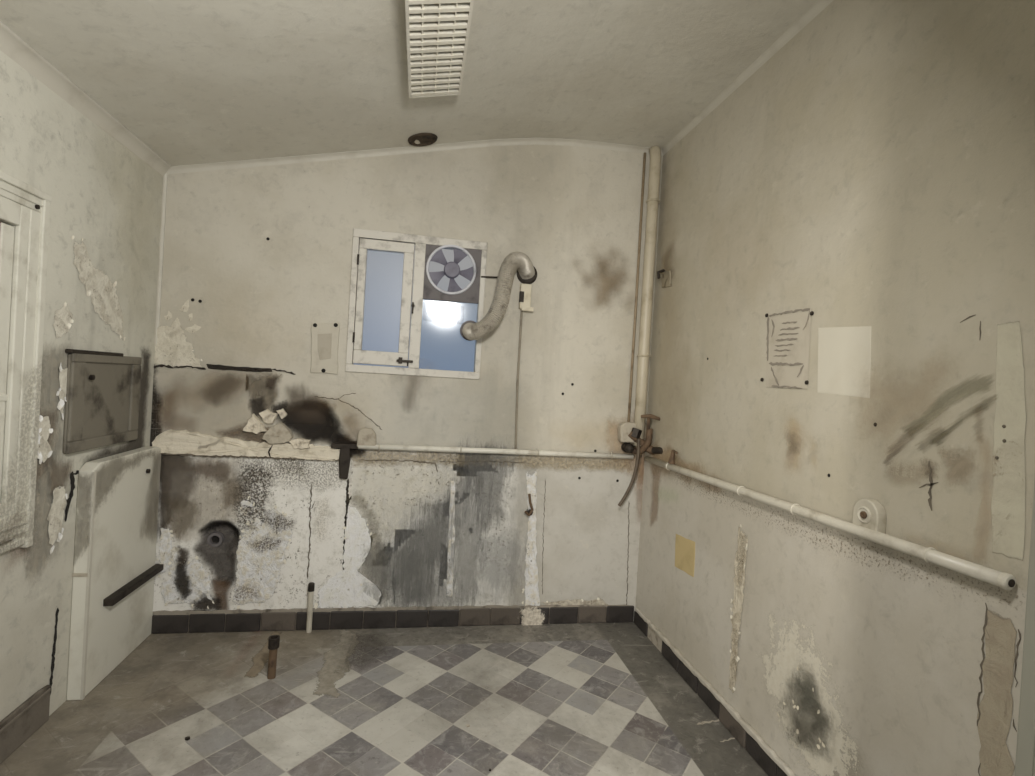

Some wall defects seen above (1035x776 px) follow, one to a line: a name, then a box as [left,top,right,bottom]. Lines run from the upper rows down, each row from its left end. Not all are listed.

peeling [154,300,203,369]
damp [89,352,300,611]
peeling [977,610,1017,776]